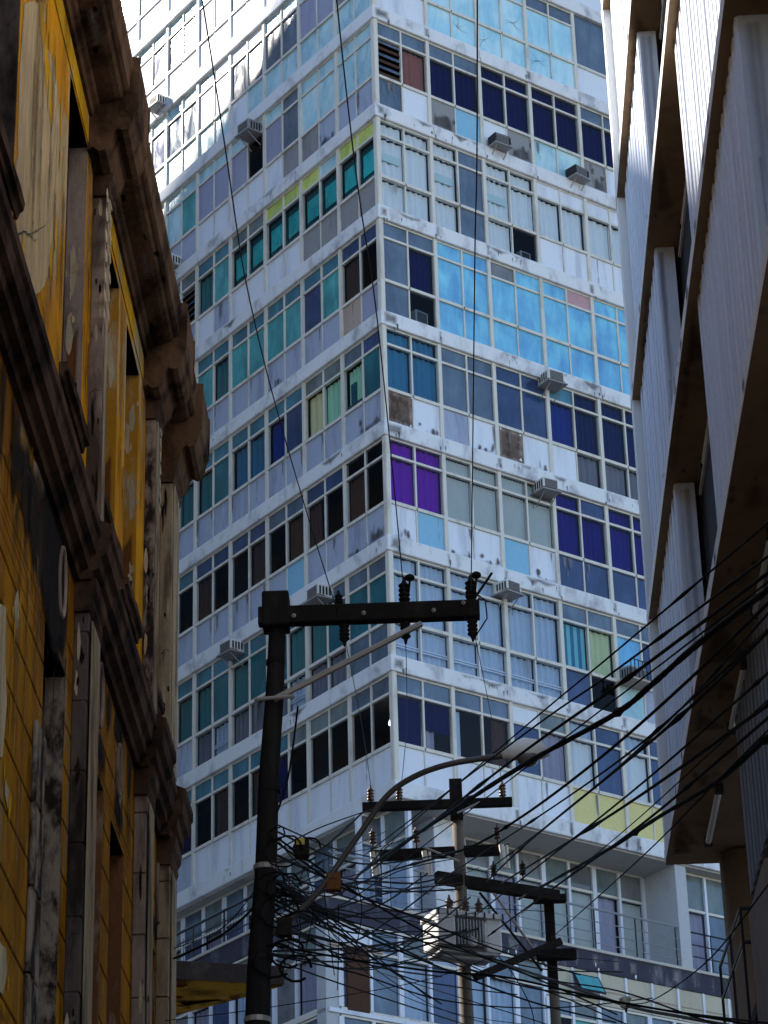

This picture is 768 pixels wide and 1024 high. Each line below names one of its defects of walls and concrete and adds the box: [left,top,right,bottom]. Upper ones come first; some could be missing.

peeling [12,1,62,295]
crack [18,222,47,241]
peeling [124,401,139,454]